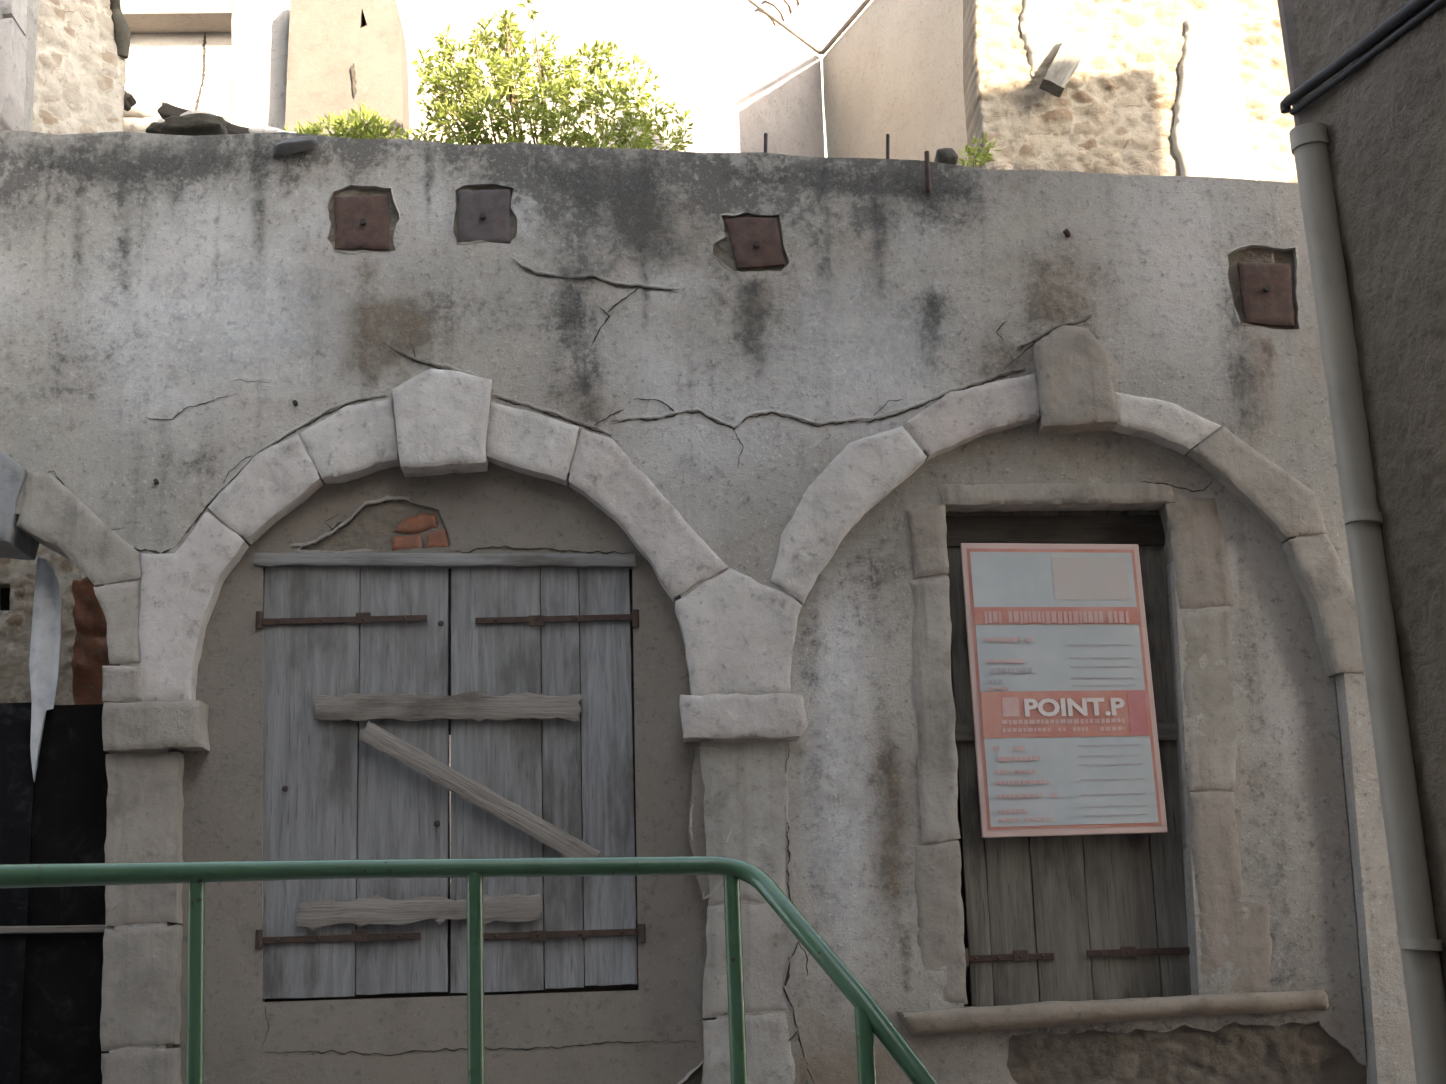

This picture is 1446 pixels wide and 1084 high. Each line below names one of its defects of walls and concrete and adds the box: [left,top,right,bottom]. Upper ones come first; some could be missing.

crack [513,256,679,346]
crack [145,379,270,420]
crack [384,312,1092,469]
crack [112,393,386,554]
crack [290,495,410,549]
flaking render [677,1060,704,1084]
flaking render [1007,1022,1367,1084]